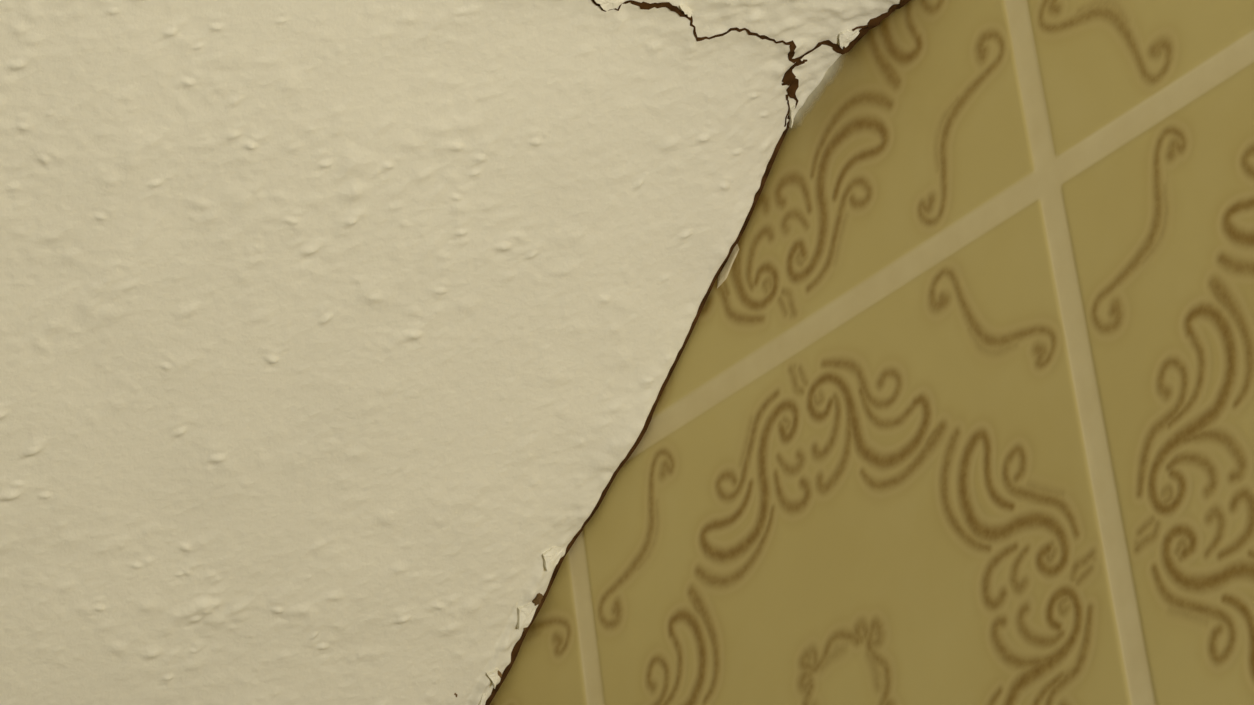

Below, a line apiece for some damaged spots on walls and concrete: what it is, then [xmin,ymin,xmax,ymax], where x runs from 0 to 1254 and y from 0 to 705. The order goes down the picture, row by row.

peeling [595,0,628,11]
peeling [838,30,859,48]
peeling [717,244,739,288]
crack [485,0,911,705]
peeling [542,547,563,572]
peeling [516,593,543,632]
peeling [478,668,502,705]